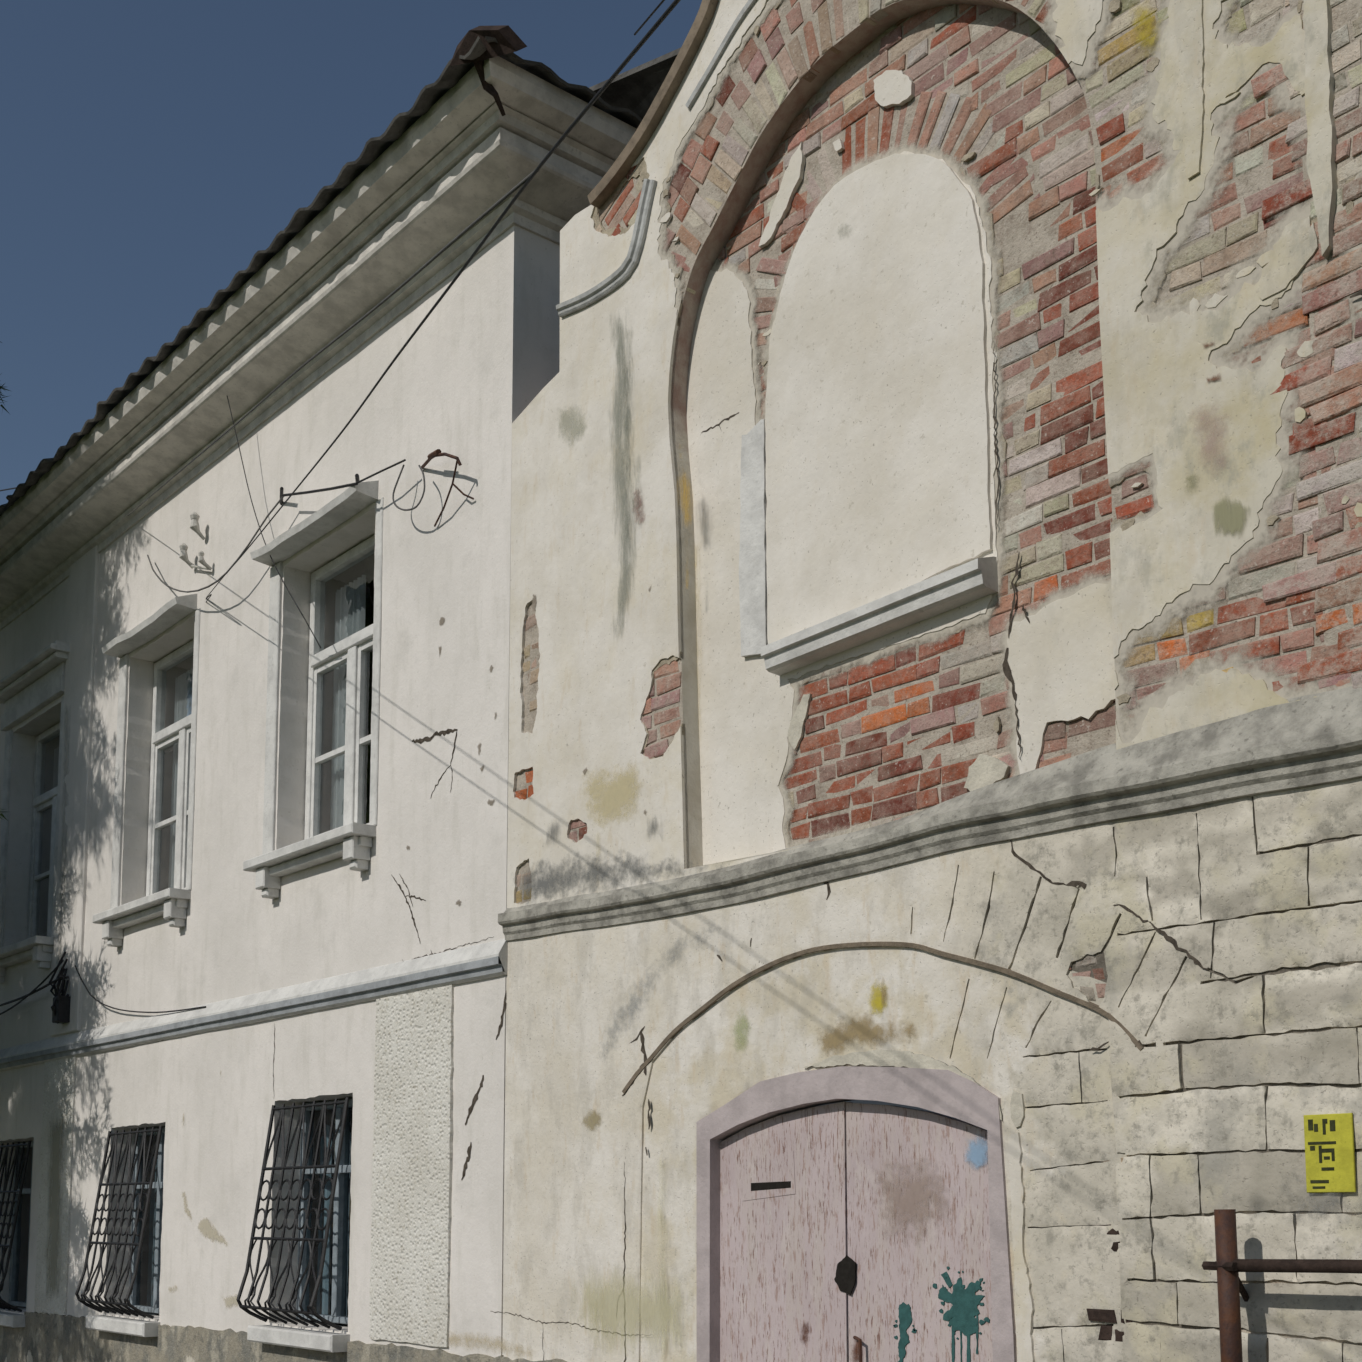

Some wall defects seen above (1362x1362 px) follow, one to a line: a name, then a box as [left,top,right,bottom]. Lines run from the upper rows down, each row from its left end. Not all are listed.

damp [615,324,630,610]
flaking render [657,0,1180,848]
flaking render [1038,0,1362,768]
flaking render [641,660,682,759]
crack [412,729,457,799]
flaking render [515,768,534,800]
flaking render [569,819,587,843]
crack [1010,840,1087,890]
crack [391,874,493,960]
crack [1113,904,1208,970]
crack [461,1075,484,1180]
crack [492,1026,651,1362]